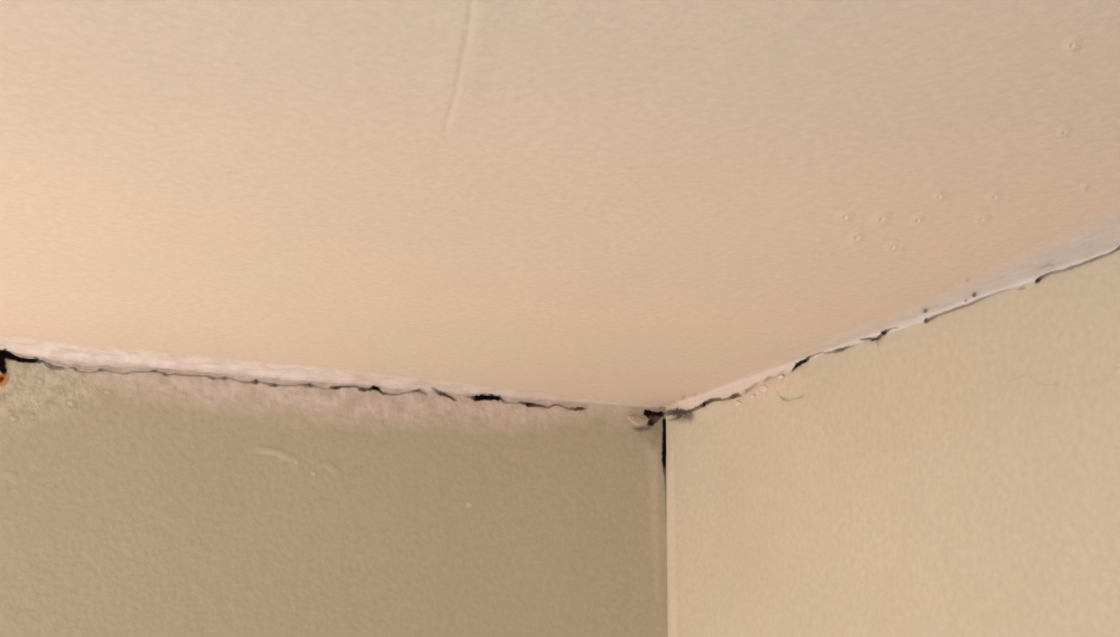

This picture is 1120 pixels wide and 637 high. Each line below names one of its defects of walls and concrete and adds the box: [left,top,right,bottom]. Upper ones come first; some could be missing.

crack [790,245,1120,372]
rust [0,372,9,388]
crack [0,348,585,411]
crack [697,393,738,409]
crack [660,418,668,475]